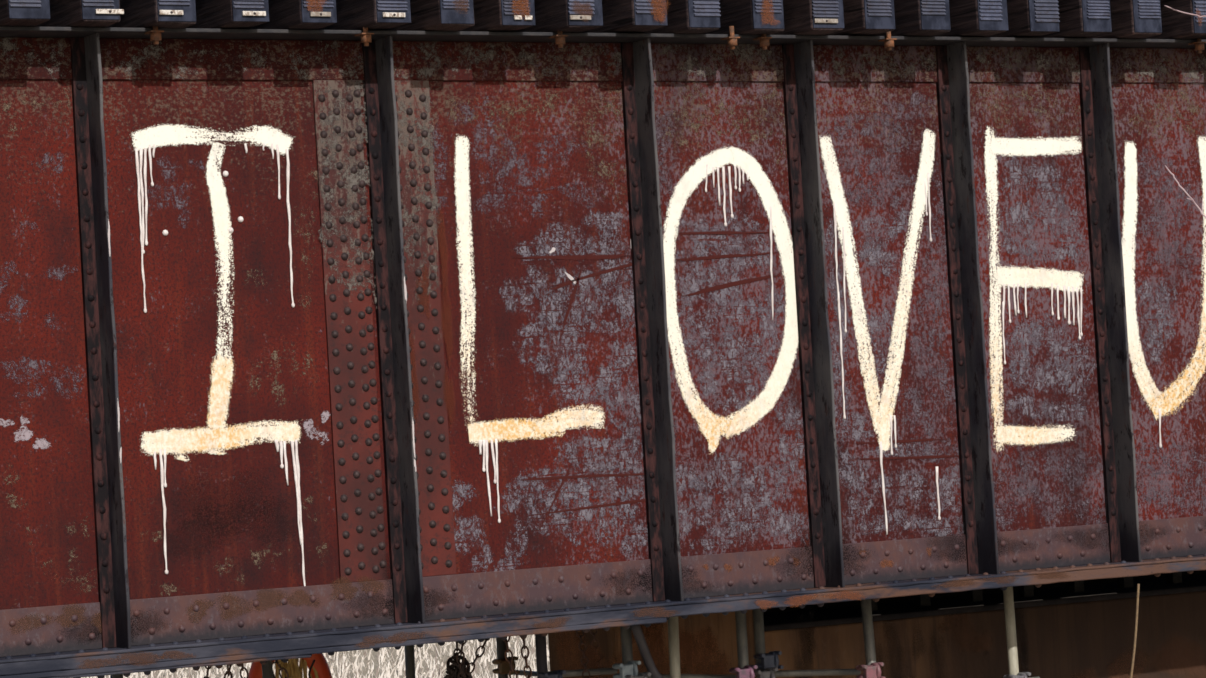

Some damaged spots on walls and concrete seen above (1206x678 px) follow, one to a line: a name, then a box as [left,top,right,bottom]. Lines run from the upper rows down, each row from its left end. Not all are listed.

rust [510,0,531,20]
rust [648,0,669,23]
rust [408,207,456,429]
rust [754,590,866,609]
rust [355,631,430,649]